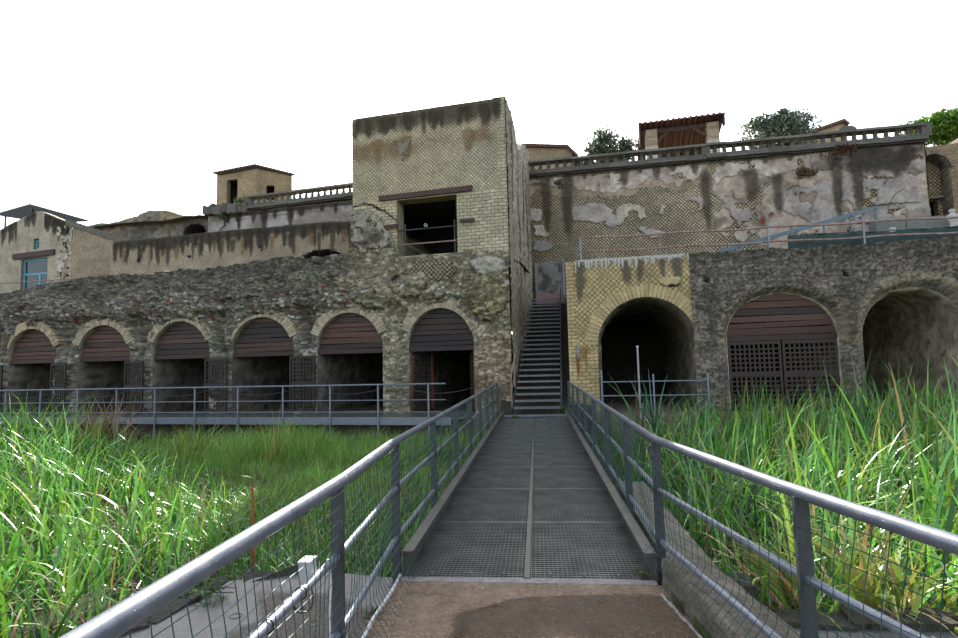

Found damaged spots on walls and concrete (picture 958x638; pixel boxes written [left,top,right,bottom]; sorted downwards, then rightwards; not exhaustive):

water stain [350,98,500,137]
peeling [530,144,932,252]
water stain [113,201,353,262]
water stain [575,254,689,297]